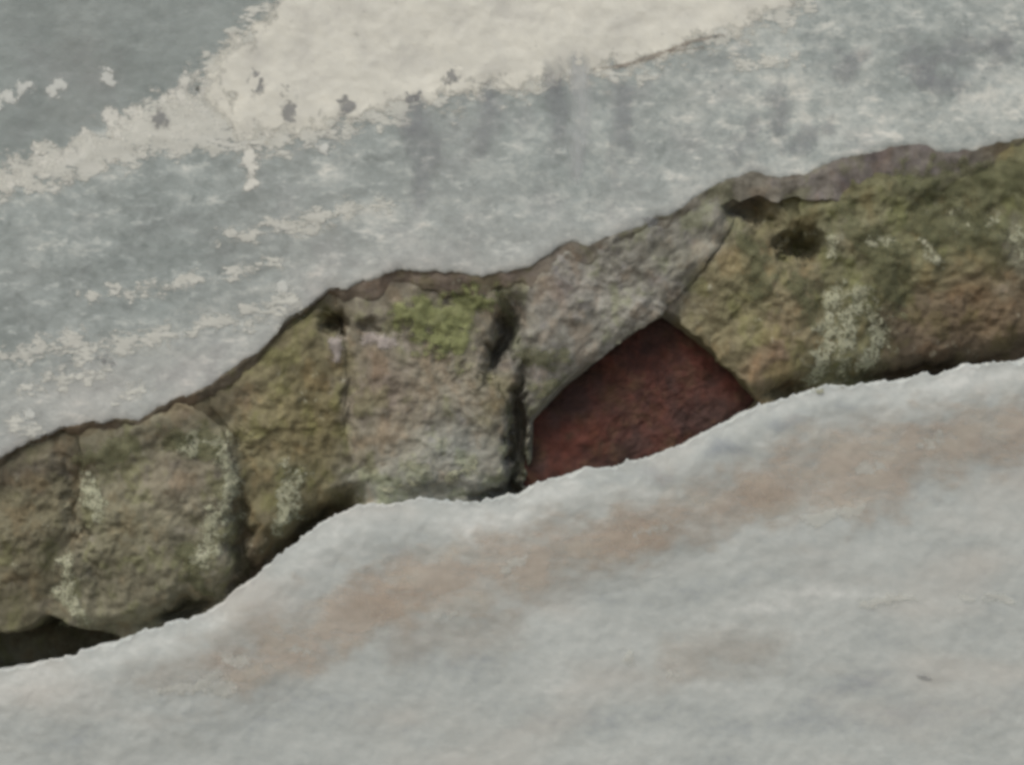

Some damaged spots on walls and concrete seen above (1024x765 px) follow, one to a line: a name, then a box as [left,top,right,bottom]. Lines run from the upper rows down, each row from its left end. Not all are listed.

peeling [0,0,818,205]
spalling [0,138,1024,668]